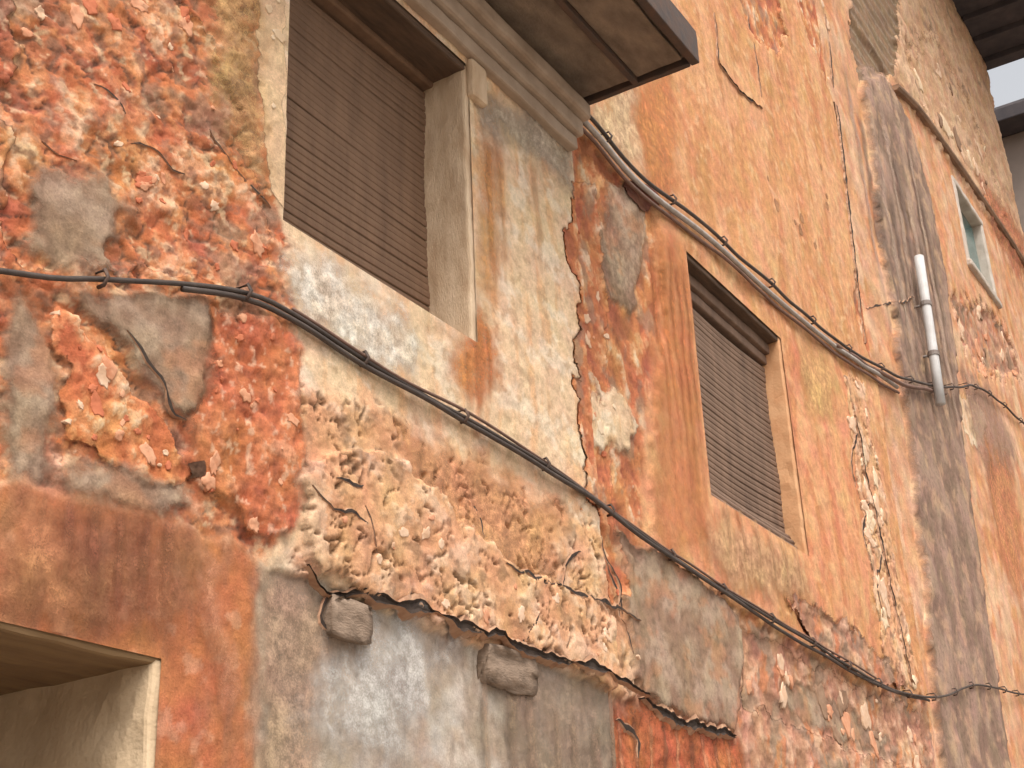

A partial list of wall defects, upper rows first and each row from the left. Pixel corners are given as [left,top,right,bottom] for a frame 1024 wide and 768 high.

flaking render [0,0,287,294]
crack [713,12,763,109]
crack [824,14,915,344]
damp [849,95,948,366]
flaking render [49,305,192,486]
flaking render [303,181,639,693]
crack [304,536,737,758]
flaking render [741,372,930,768]
crack [850,402,916,685]
damp [962,370,1014,493]